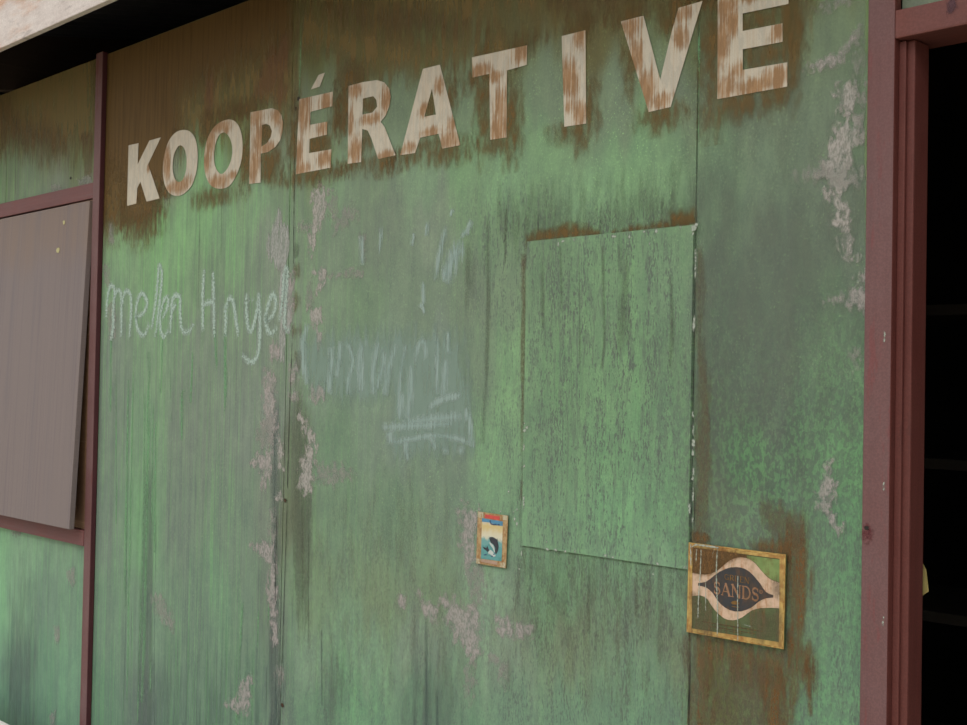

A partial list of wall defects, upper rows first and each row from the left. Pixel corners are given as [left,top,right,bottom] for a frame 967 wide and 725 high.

rust [0,0,458,237]
rust [469,74,519,157]
rust [664,0,787,122]
rust [743,0,802,76]
peeling [802,28,867,262]
peeling [250,208,299,489]
peeling [301,183,362,351]
rust [527,225,600,241]
peeling [297,413,351,497]
peeling [249,512,278,648]
peeling [418,500,505,676]
rust [688,523,814,725]